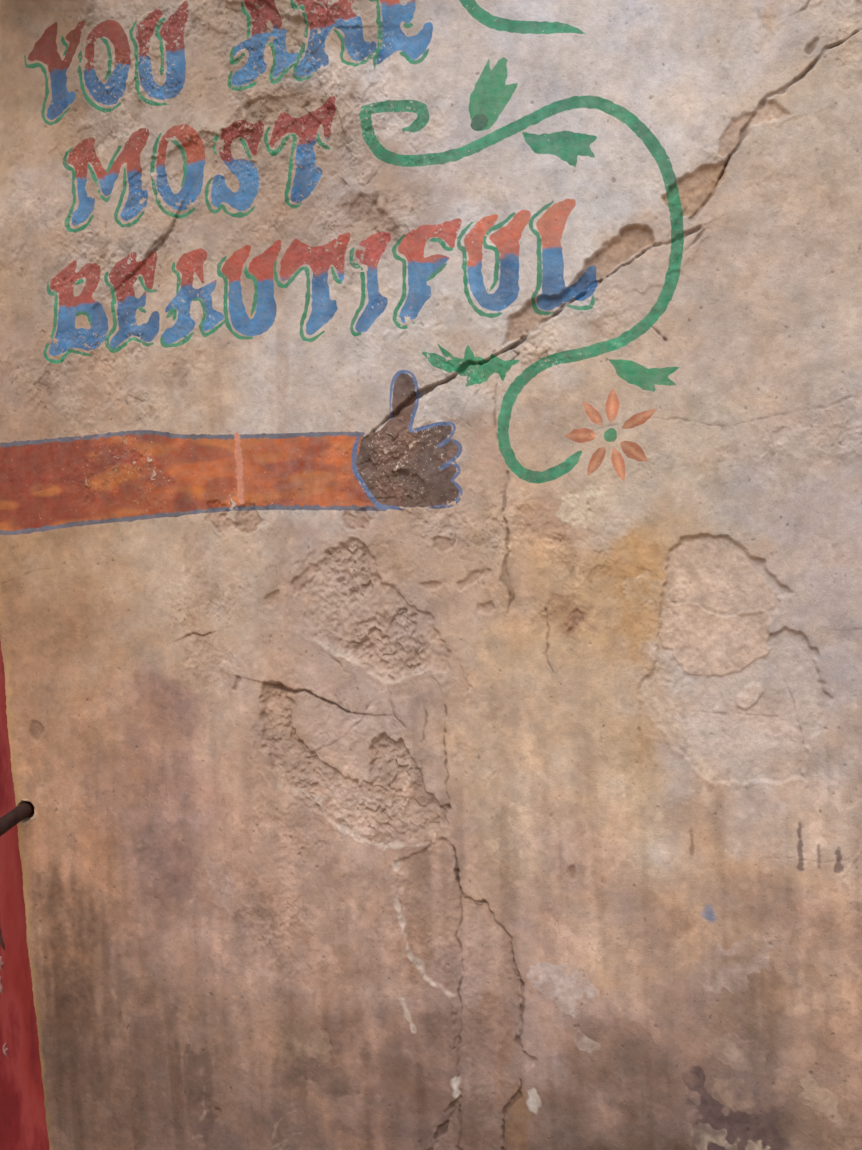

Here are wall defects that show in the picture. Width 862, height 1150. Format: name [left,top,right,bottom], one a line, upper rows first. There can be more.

crack [364,27,862,617]
damp [116,806,200,940]
crack [261,679,373,754]
spalling [255,512,605,1150]
crack [441,700,453,811]
crack [543,606,557,676]
spalling [635,531,836,789]
damp [23,842,131,1124]
damp [162,1027,224,1150]
damp [252,1056,361,1150]
crack [451,845,536,1150]
damp [537,959,802,1150]